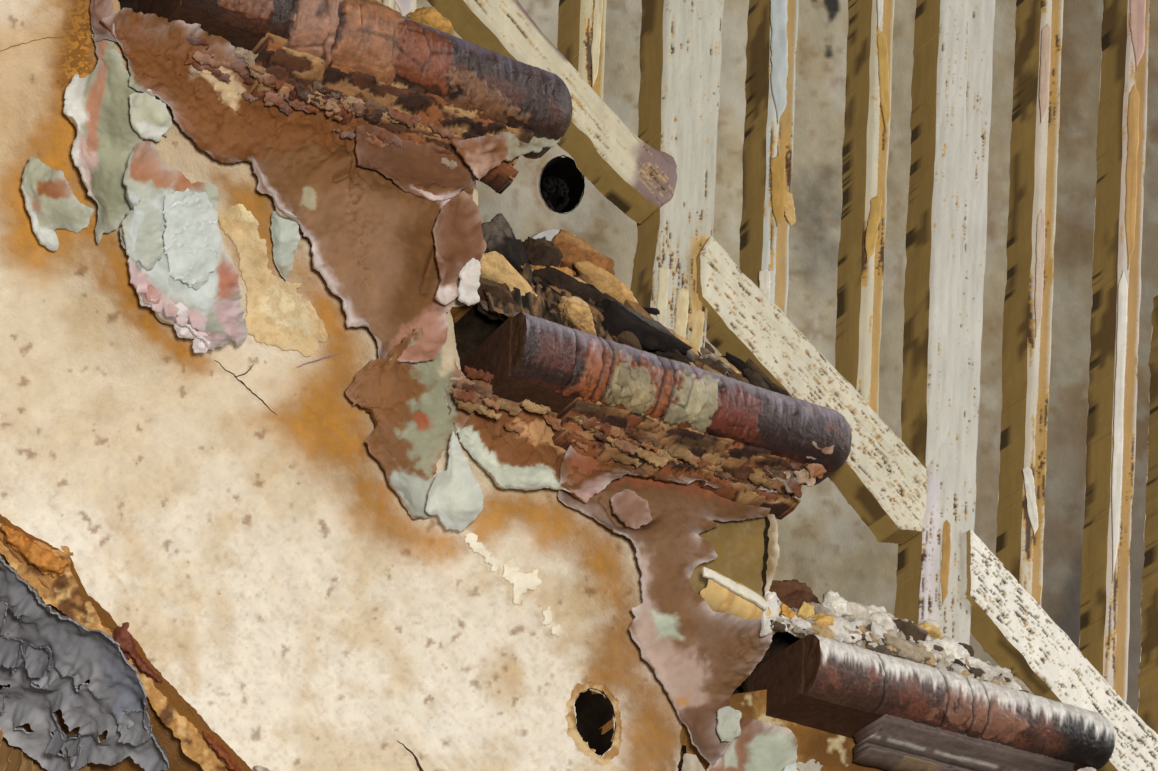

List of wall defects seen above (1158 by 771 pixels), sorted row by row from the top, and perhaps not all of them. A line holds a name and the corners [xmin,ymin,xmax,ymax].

crack [397,740,423,771]
peeling [0,0,835,771]